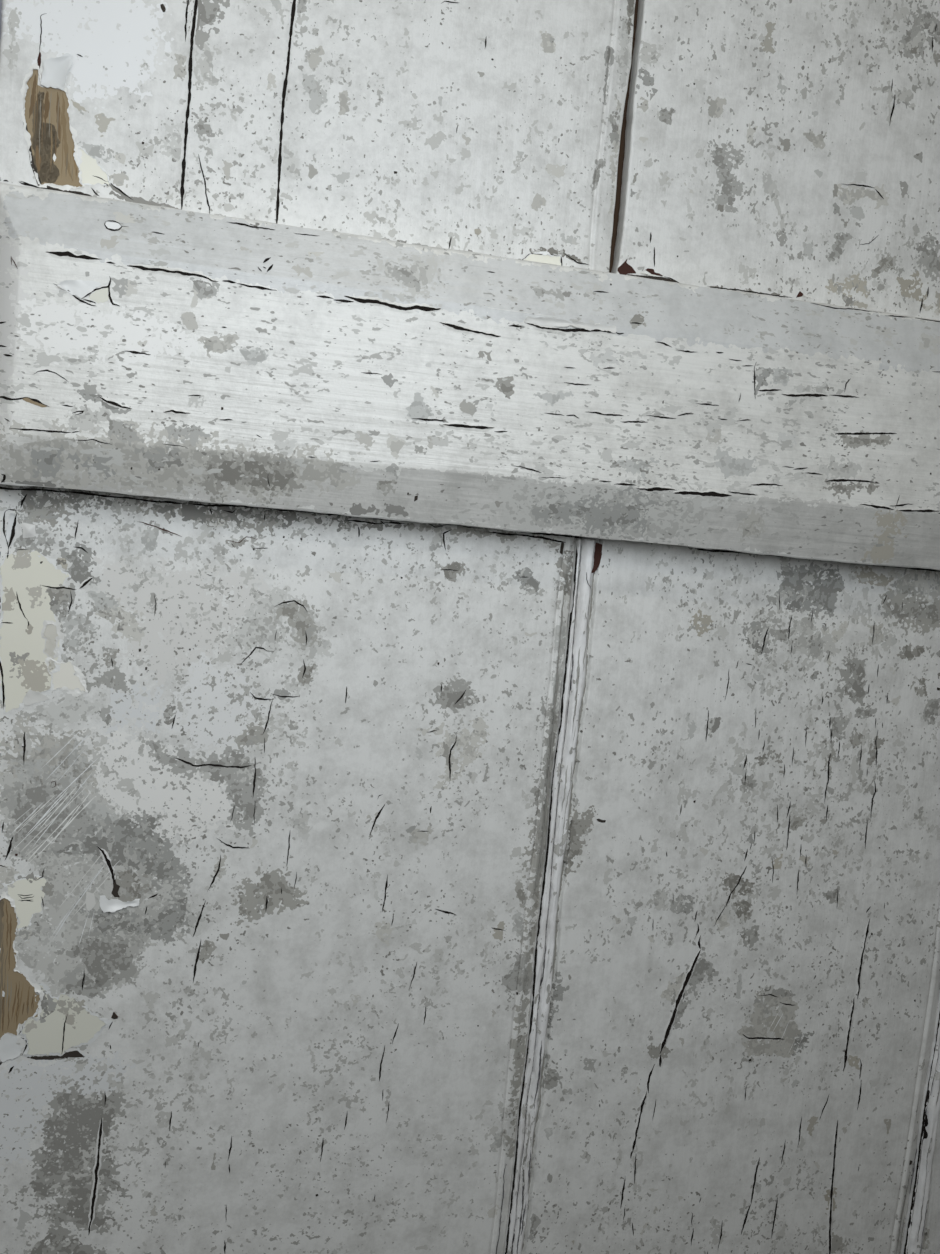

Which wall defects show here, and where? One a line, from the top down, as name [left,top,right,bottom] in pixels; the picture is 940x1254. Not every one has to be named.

peeling [20,53,111,196]
crack [48,0,316,306]
crack [0,322,132,445]
crack [412,418,507,433]
crack [317,295,858,423]
crack [602,466,940,514]
peeling [0,513,88,714]
crack [176,600,307,982]
peeling [0,874,118,1062]
peeling [99,872,140,913]
crack [621,593,903,1254]
crack [88,1094,106,1235]